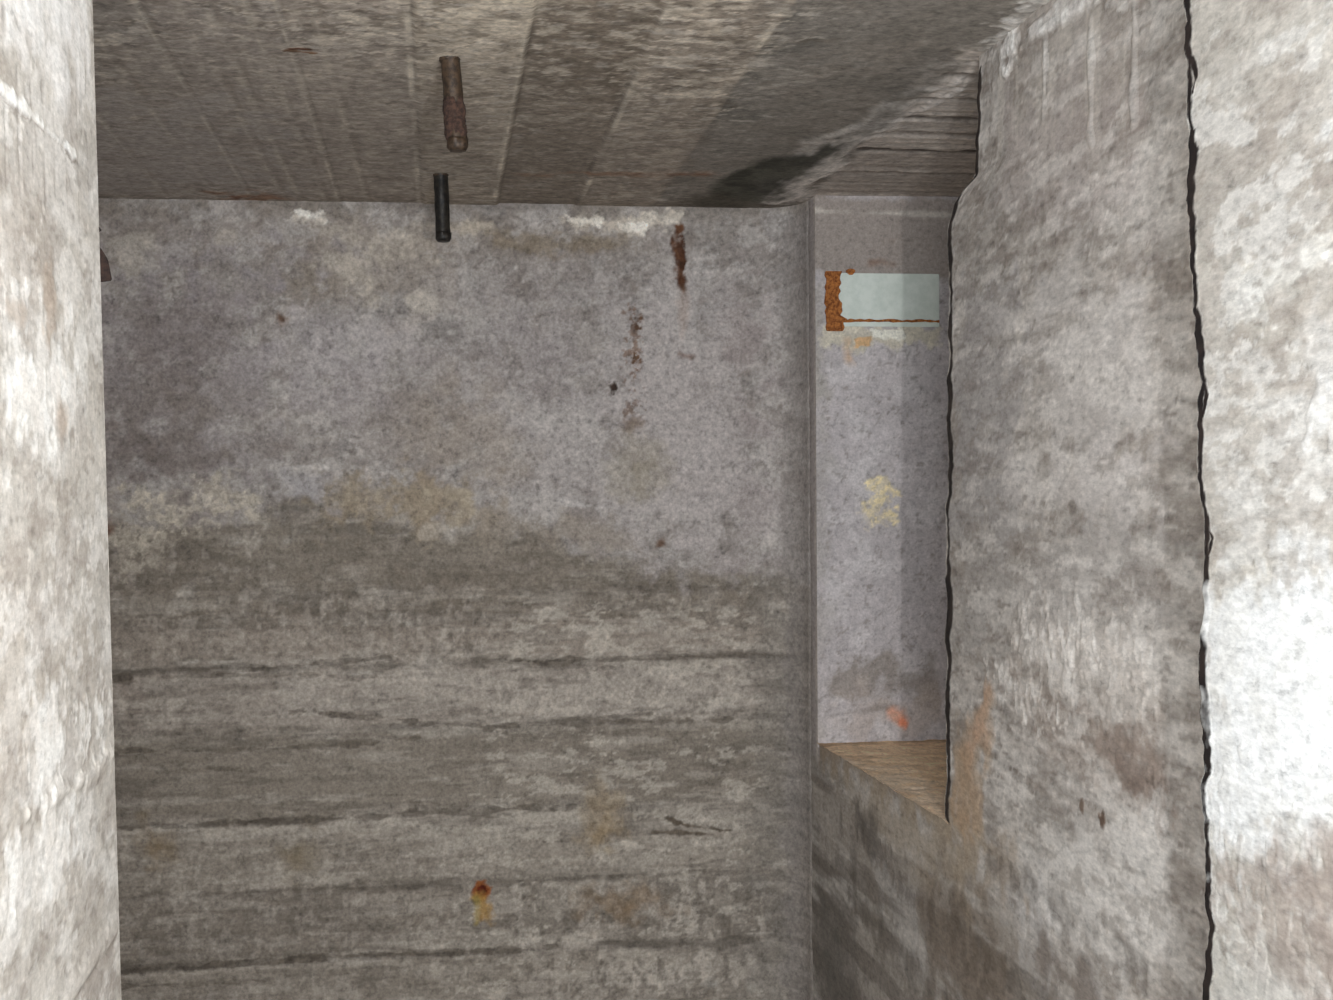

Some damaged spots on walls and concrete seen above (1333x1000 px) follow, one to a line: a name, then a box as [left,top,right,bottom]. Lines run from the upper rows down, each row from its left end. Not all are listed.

corrosion [442,96,468,140]
leakage [637,0,1159,208]
corrosion [668,222,697,361]
crack [1183,0,1215,582]
corrosion [591,296,685,512]
crack [944,63,982,826]
corrosion [468,878,497,928]
crack [1198,639,1216,1000]